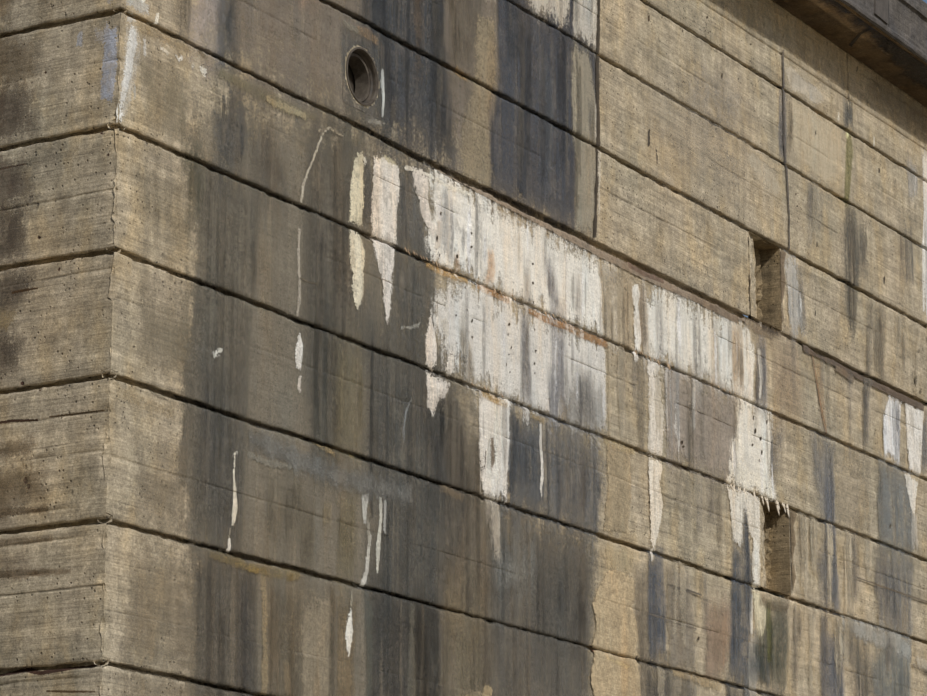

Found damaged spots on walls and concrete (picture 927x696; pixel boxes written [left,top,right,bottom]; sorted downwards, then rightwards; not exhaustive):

crack [776,50,790,251]
leakage [900,152,927,324]
leakage [133,0,796,696]
leakage [805,451,856,602]
leakage [878,396,927,551]
leakage [823,625,909,696]